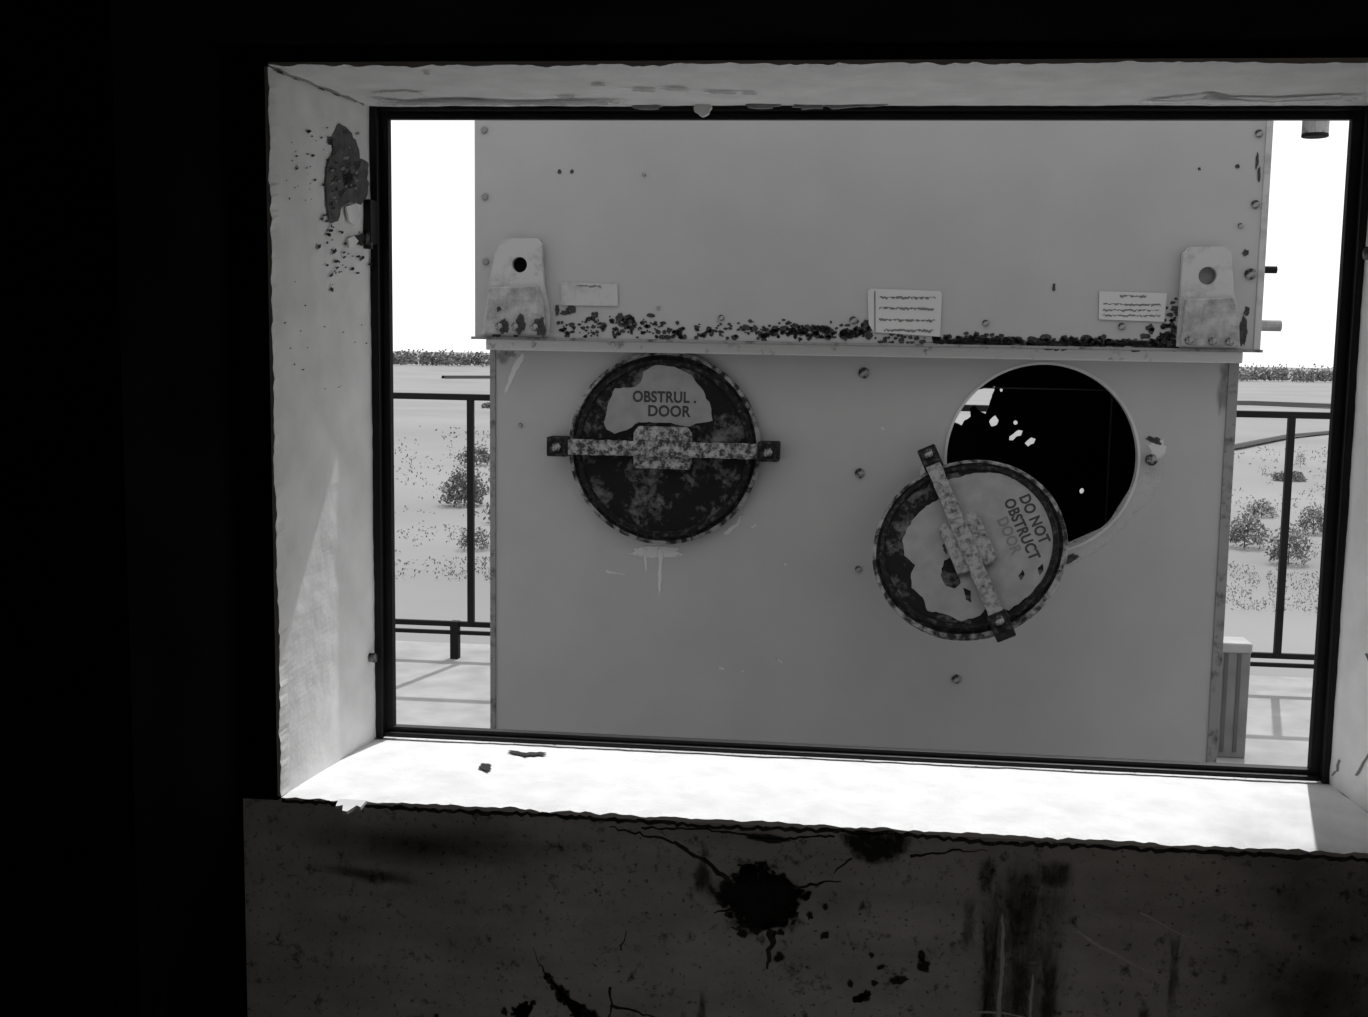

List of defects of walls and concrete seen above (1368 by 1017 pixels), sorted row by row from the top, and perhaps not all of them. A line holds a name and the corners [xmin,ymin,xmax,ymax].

peeling [286,123,372,292]
leakage [833,831,994,892]
crack [608,987,654,1017]
leakage [971,865,1068,1017]